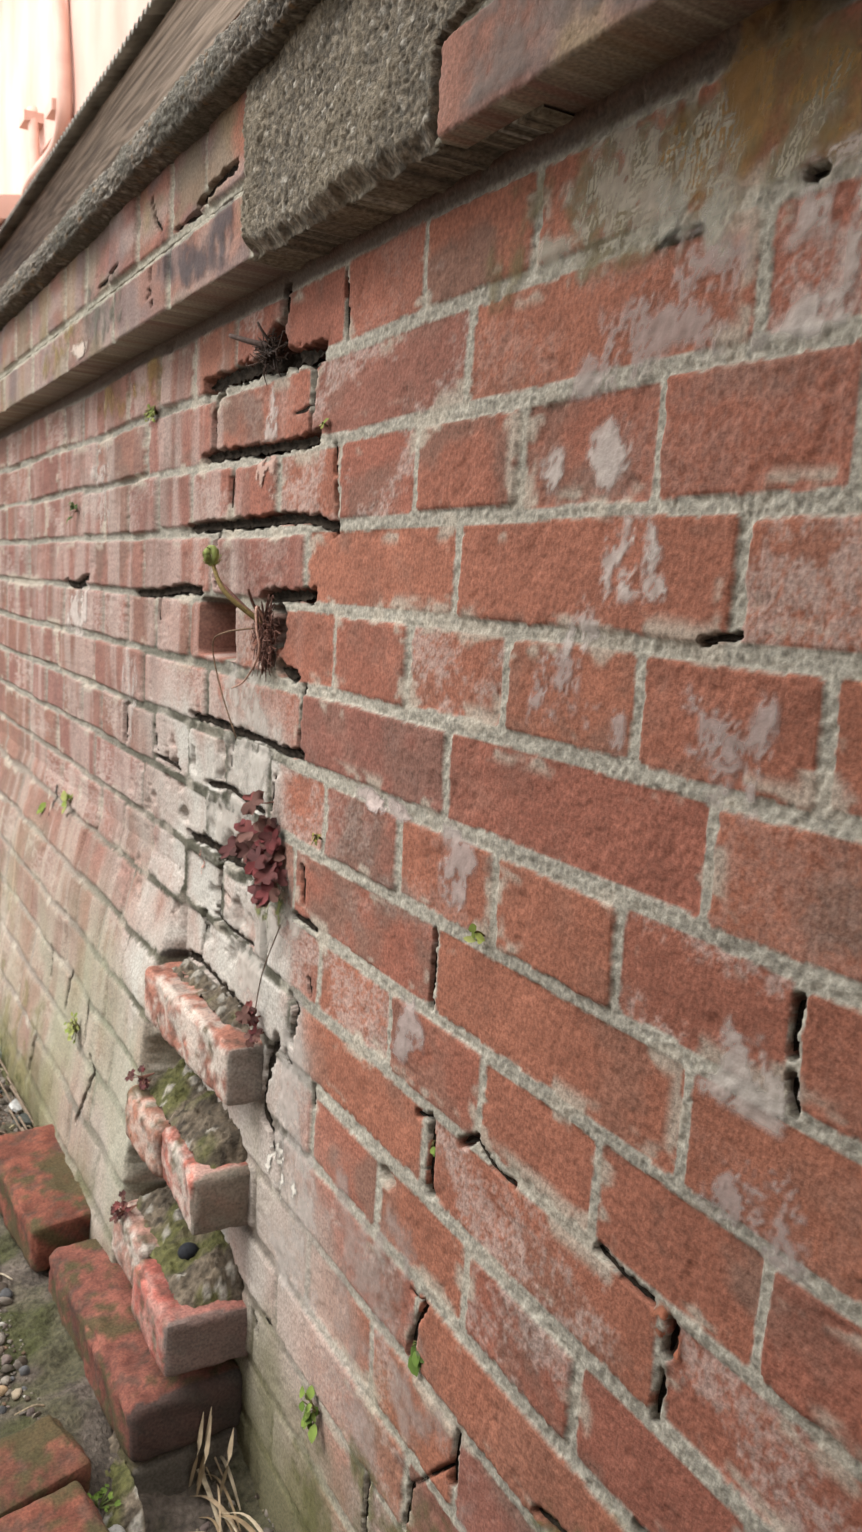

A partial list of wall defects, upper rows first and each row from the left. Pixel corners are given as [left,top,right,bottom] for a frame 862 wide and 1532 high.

water stain [542,92,754,394]
water stain [783,230,861,335]
crack [192,348,340,545]
water stain [589,420,626,487]
crack [138,585,203,624]
crack [270,589,317,603]
water stain [602,519,666,600]
spalling [172,958,250,1033]
spalling [146,1058,248,1169]
spalling [265,1143,296,1200]
spalling [136,1185,244,1308]
crack [600,1245,655,1301]